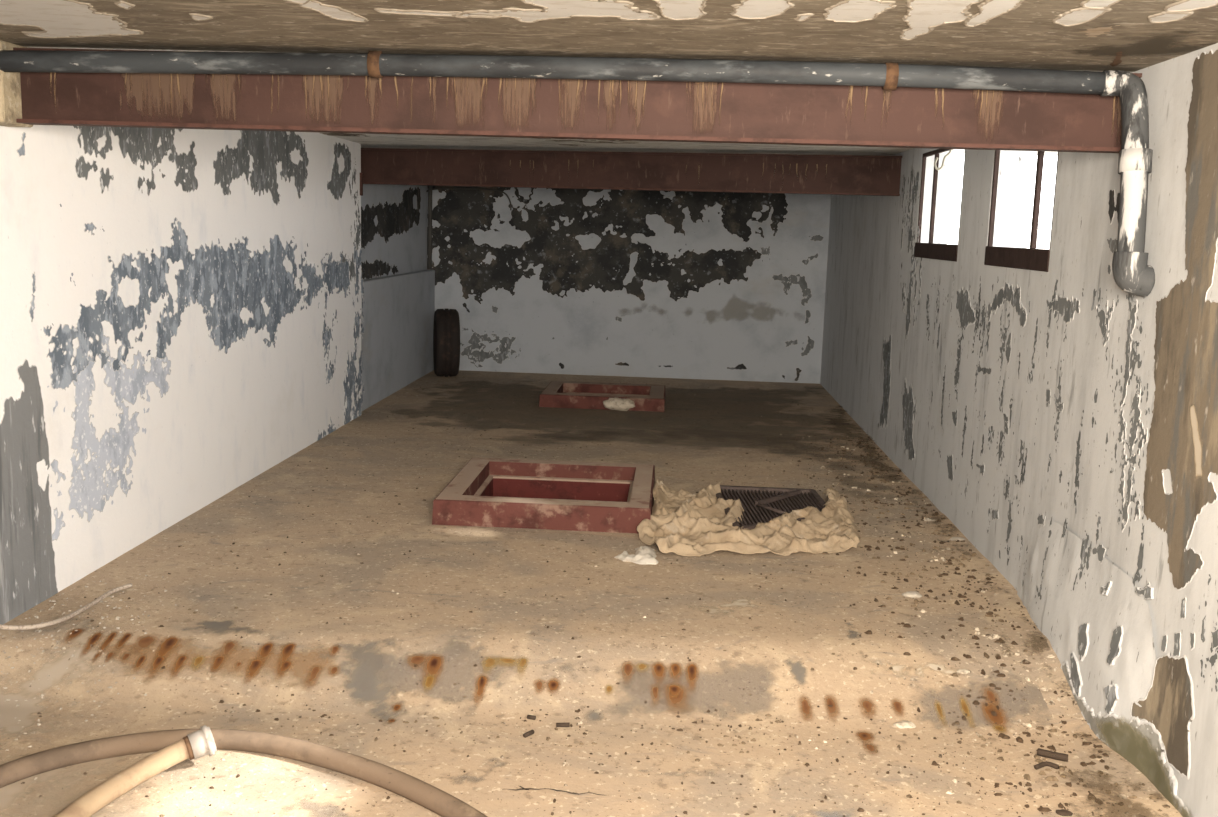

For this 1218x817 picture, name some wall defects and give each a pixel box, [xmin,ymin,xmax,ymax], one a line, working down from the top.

peeling [374,8,502,19]
peeling [1080,0,1122,9]
peeling [1148,11,1194,23]
rust [120,73,241,121]
rust [429,77,541,128]
peeling [772,234,824,381]
peeling [0,126,788,625]
peeling [878,48,1218,812]
rust [66,629,339,685]
rust [476,658,527,698]
rust [535,679,559,692]
rust [623,662,697,711]